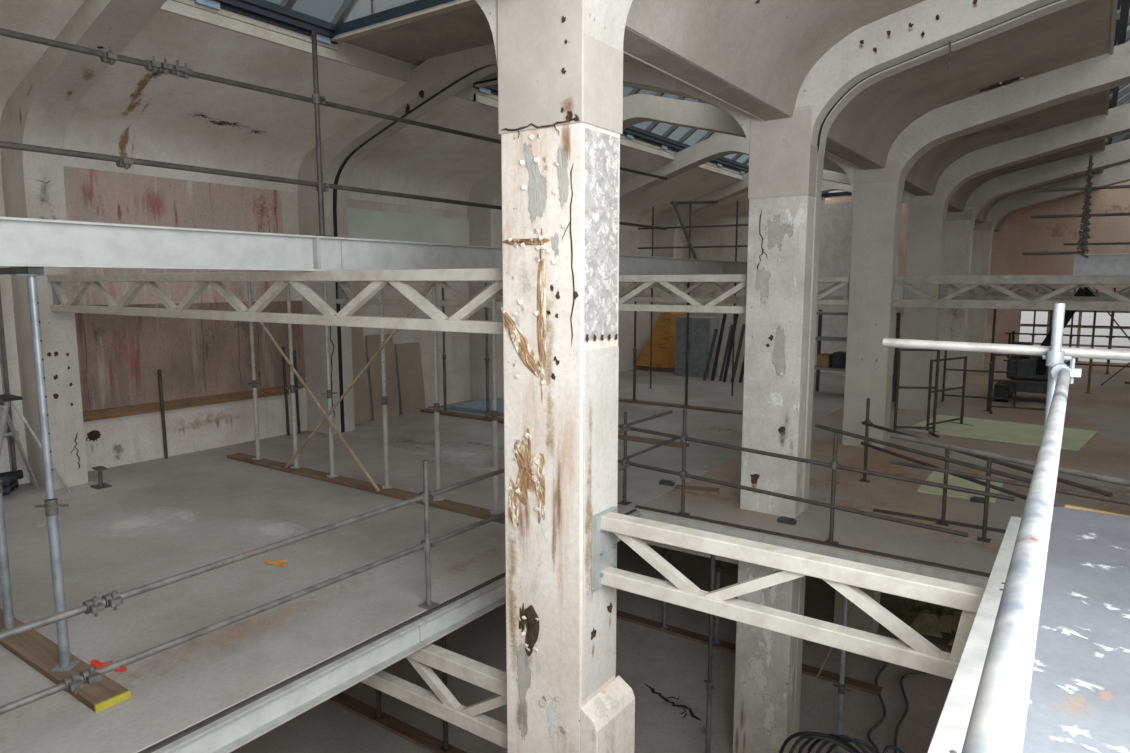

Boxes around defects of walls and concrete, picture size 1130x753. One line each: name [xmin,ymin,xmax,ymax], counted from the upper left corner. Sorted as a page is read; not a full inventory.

corrosion [119,75,151,156]
peeling [508,133,569,265]
spalling [518,603,539,656]